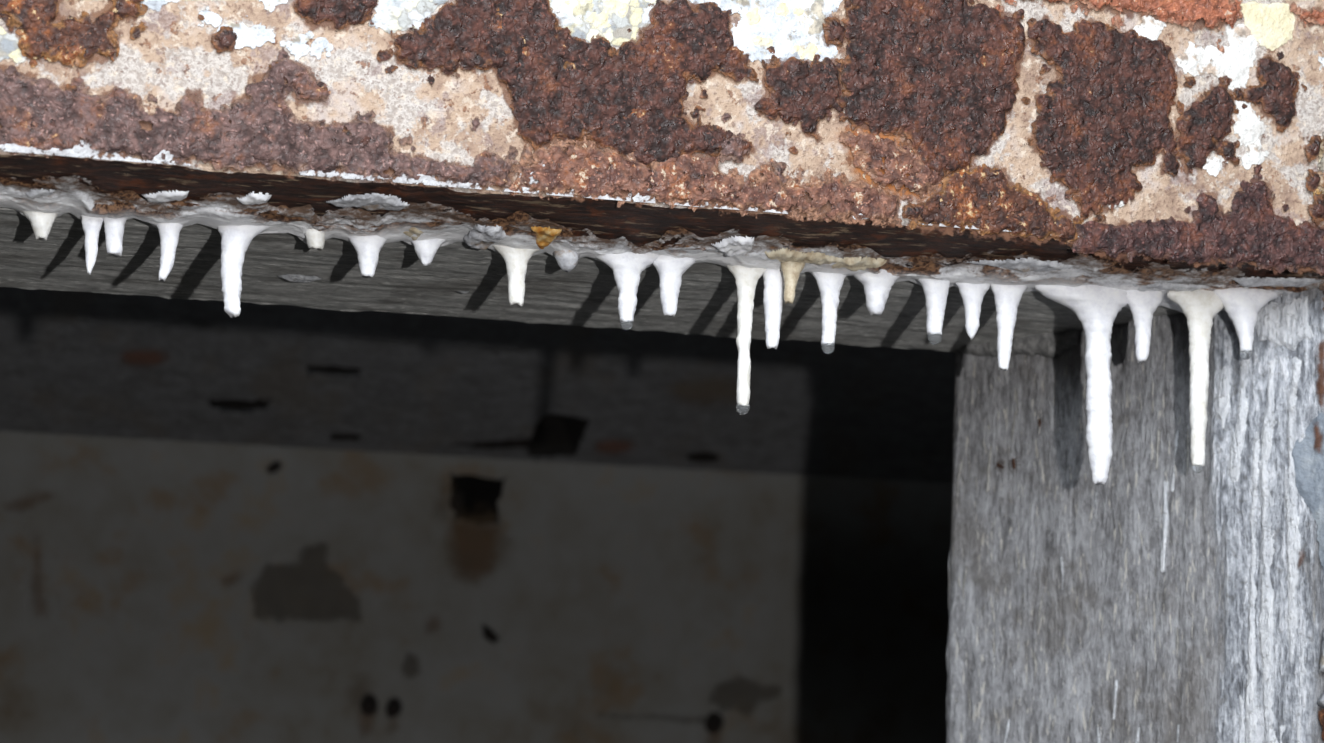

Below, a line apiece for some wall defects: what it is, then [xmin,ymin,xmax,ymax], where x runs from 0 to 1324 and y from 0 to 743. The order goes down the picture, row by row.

damp [0,140,191,166]
corrosion [0,0,1324,310]
corrosion [1316,341,1324,405]
damp [0,164,1324,743]
corrosion [1314,425,1322,451]
hole [449,474,505,526]
peeling [1291,411,1324,574]